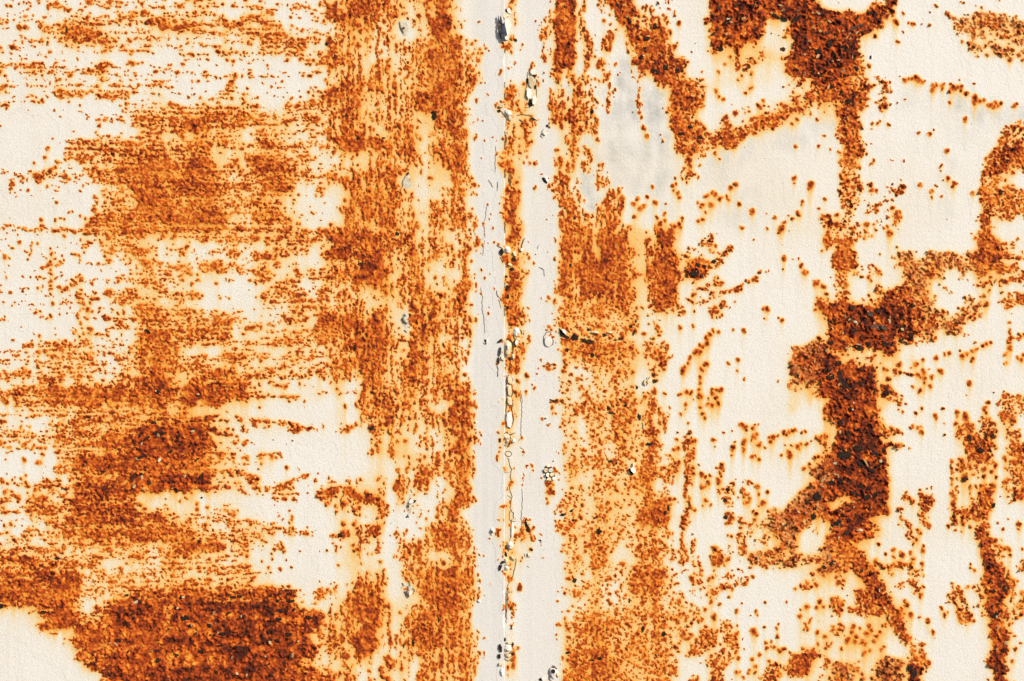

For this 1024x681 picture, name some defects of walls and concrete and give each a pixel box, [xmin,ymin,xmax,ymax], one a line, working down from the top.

peeling [525,69,537,108]
corrosion [0,0,784,681]
corrosion [324,0,1024,681]
peeling [506,374,523,428]
spalling [543,464,555,481]
spalling [539,665,560,681]